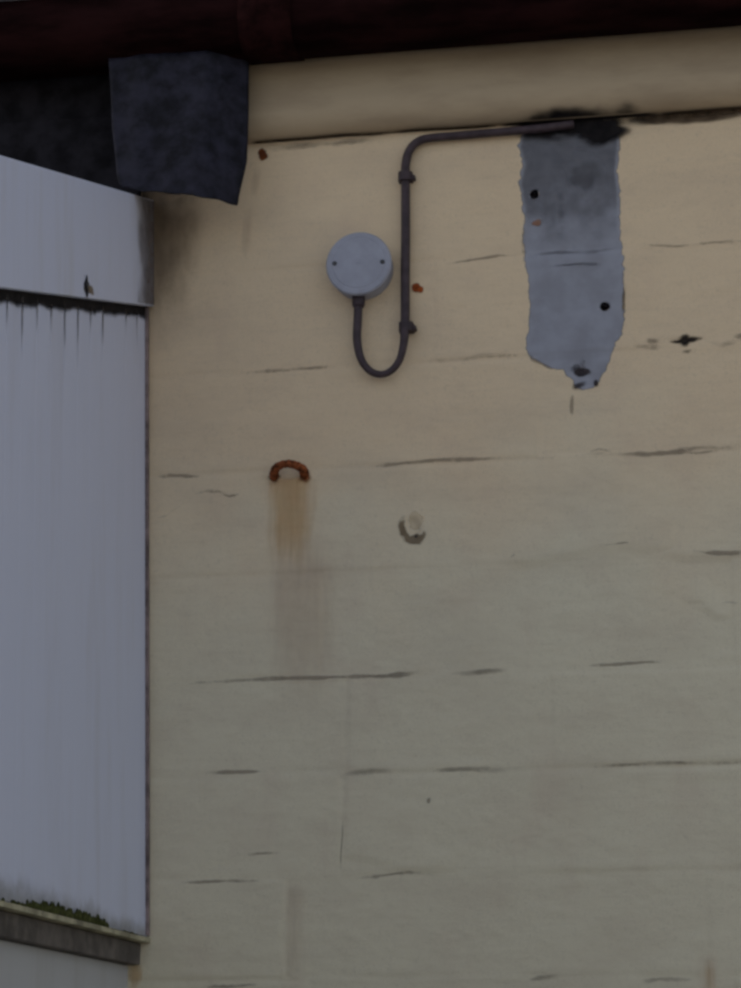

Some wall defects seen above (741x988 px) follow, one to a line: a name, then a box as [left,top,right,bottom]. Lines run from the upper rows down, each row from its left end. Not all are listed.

damp [503,109,653,145]
peeling [517,134,625,390]
spalling [399,512,426,544]